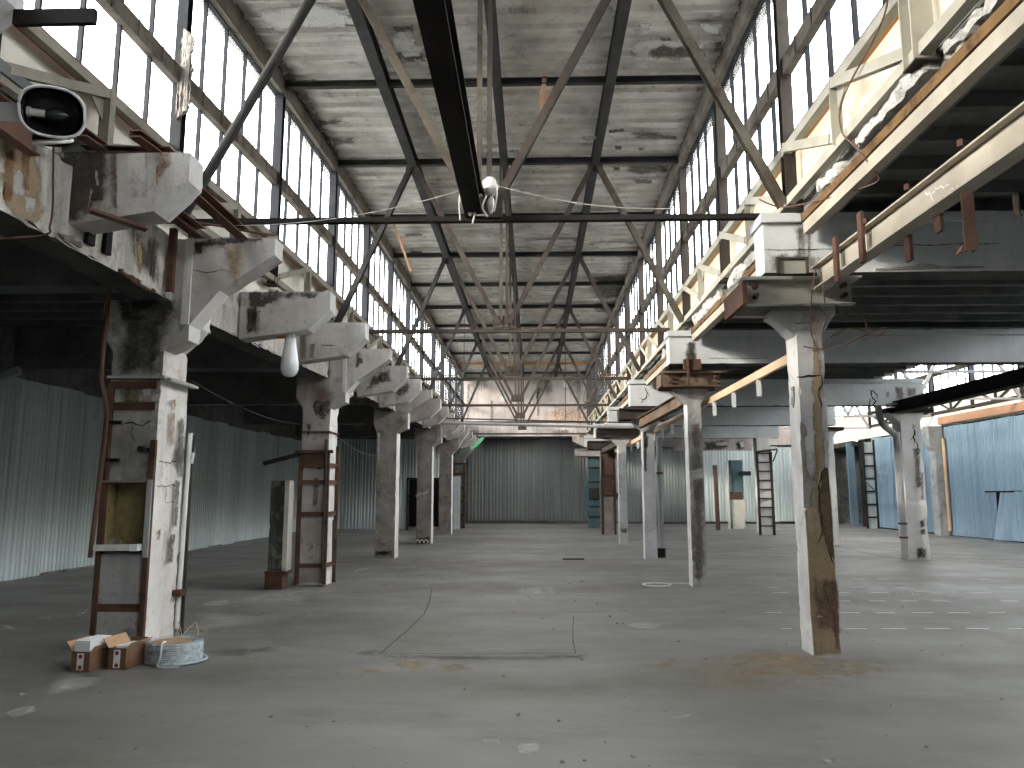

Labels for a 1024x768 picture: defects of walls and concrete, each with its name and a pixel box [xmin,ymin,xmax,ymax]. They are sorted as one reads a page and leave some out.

peeling [2,140,44,223]
water stain [120,301,172,374]
water stain [247,290,318,332]
peeling [800,422,841,655]